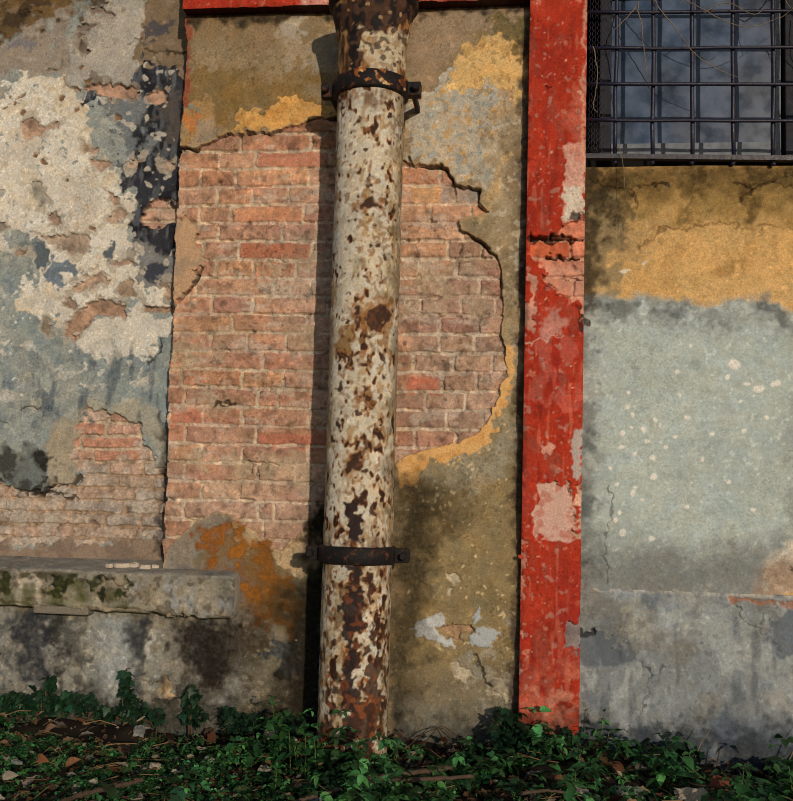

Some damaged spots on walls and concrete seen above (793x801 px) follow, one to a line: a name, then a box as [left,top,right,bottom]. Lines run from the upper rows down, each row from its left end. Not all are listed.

crack [631,181,670,202]
crack [732,179,777,190]
flaking render [525,217,585,333]
flaking render [0,52,337,569]
rust [336,303,392,368]
flaking render [394,160,508,464]
rust [343,500,365,543]
leakage [12,613,65,693]
leakage [46,614,85,661]
leakage [128,618,148,661]
rust [320,582,390,754]
crack [580,627,596,638]